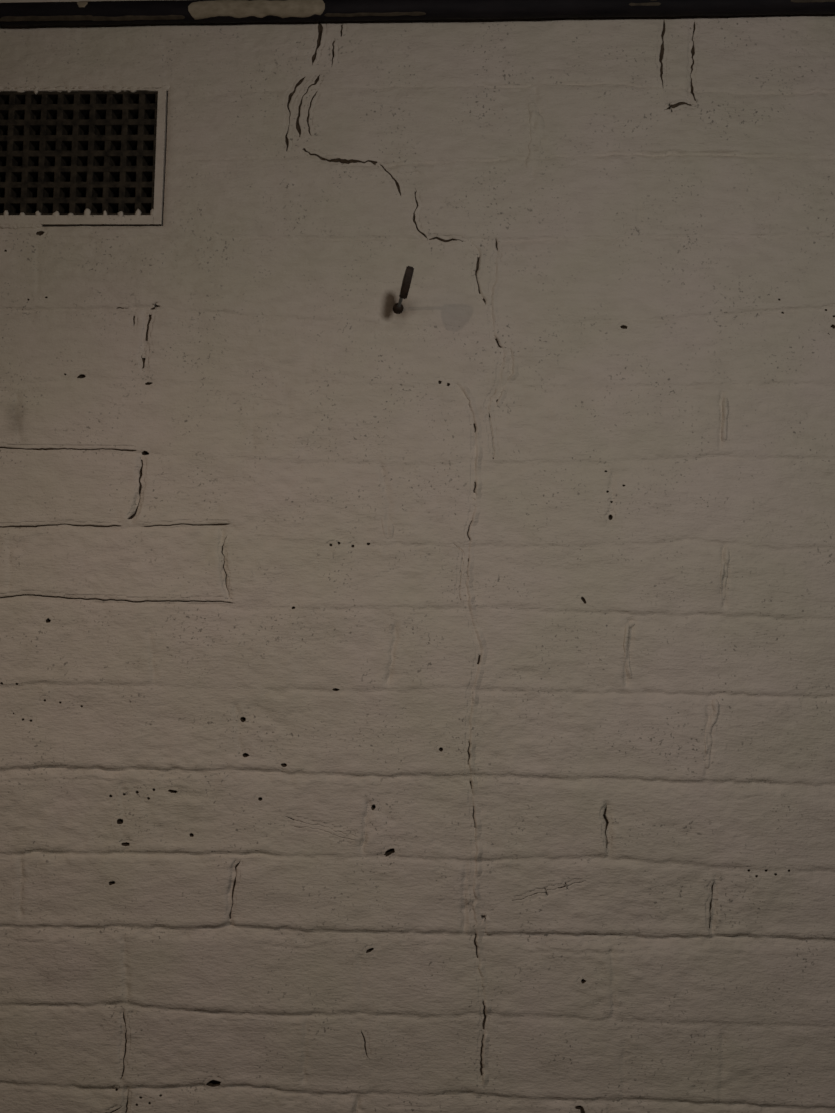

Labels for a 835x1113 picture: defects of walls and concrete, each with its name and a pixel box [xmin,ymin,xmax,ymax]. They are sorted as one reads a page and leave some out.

crack [656,18,701,112]
crack [282,21,519,1092]
crack [511,878,586,903]